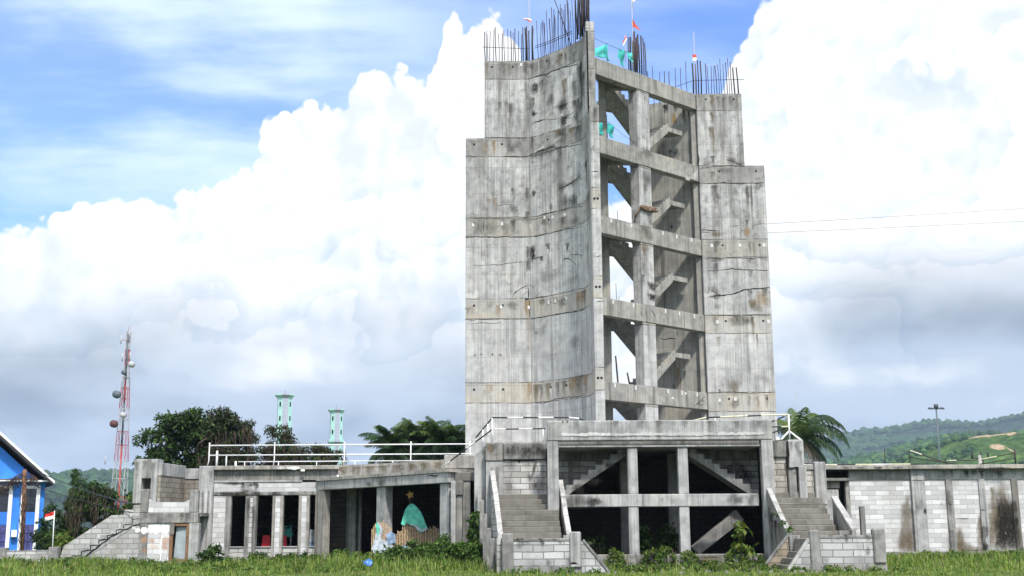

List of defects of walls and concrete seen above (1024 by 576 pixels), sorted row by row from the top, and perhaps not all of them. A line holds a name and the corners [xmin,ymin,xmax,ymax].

crack [465,171,603,324]
crack [705,257,770,316]
leakage [900,499,913,550]
leakage [957,488,1020,551]